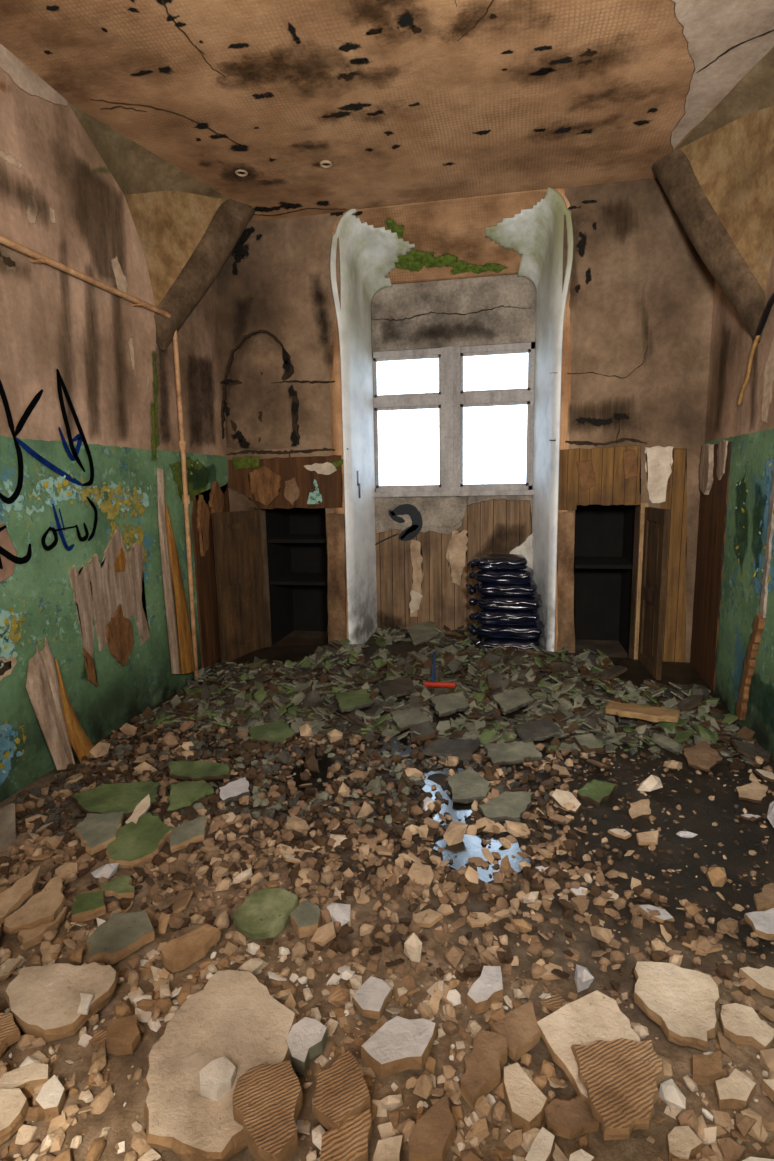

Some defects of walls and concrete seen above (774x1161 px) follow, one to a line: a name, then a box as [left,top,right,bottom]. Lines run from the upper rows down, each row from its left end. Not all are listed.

damp [157,0,186,27]
crack [162,0,225,77]
damp [229,22,390,99]
damp [358,0,422,38]
crack [455,0,494,41]
damp [529,46,620,78]
peeling [670,0,774,149]
crack [90,99,239,145]
damp [193,123,248,152]
damp [322,102,386,120]
damp [575,222,596,293]
spalling [623,446,673,503]